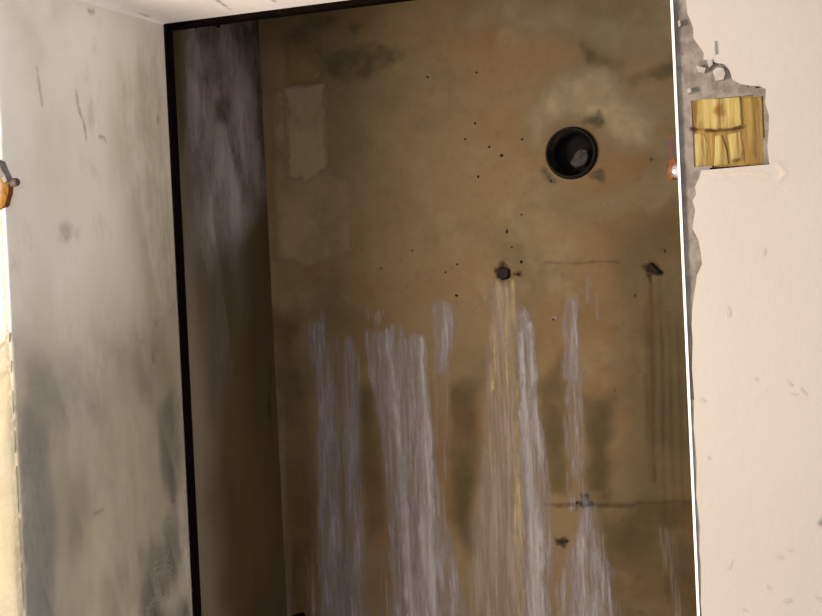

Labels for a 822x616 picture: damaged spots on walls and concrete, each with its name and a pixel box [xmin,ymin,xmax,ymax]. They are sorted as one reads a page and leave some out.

damp [312,323,364,616]
damp [367,328,459,616]
damp [470,281,613,616]
spalling [674,0,769,616]